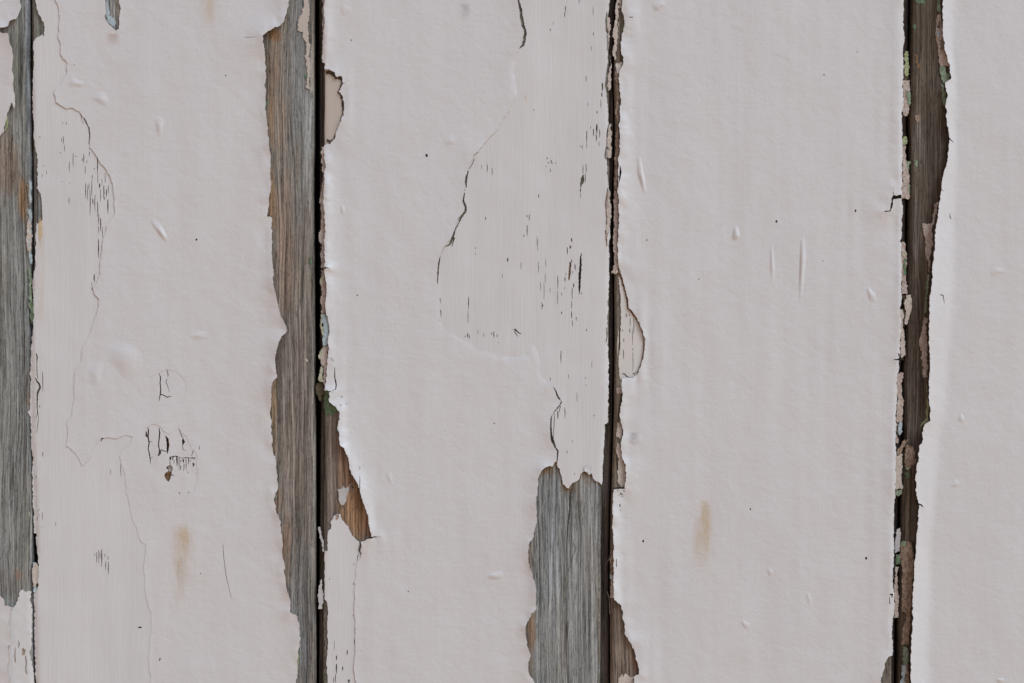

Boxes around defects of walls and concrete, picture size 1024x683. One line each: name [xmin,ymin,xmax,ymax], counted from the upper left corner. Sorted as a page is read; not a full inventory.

peeling [0,0,198,683]
crack [145,429,200,464]
peeling [263,0,372,683]
crack [437,160,474,321]
peeling [435,0,646,683]
peeling [881,0,954,683]